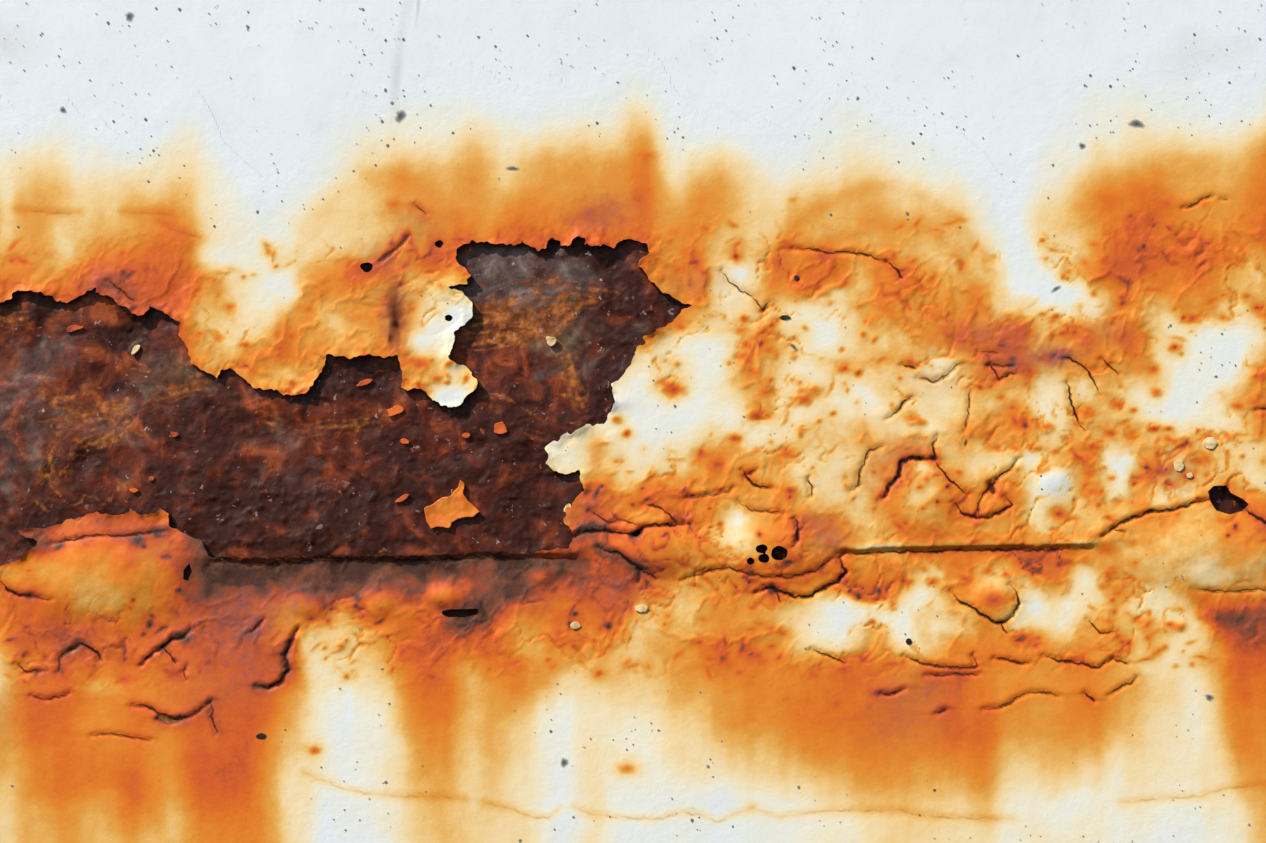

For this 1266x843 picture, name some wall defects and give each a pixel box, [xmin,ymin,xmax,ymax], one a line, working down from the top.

corrosion [0,47,1266,566]
crack [723,273,767,310]
crack [800,248,902,277]
crack [1060,356,1117,430]
crack [854,351,1016,519]
crack [1106,500,1206,534]
corrosion [0,279,1266,843]
crack [18,642,99,700]
crack [143,630,189,677]
crack [261,629,297,689]
crack [909,588,1135,709]
crack [93,704,217,740]